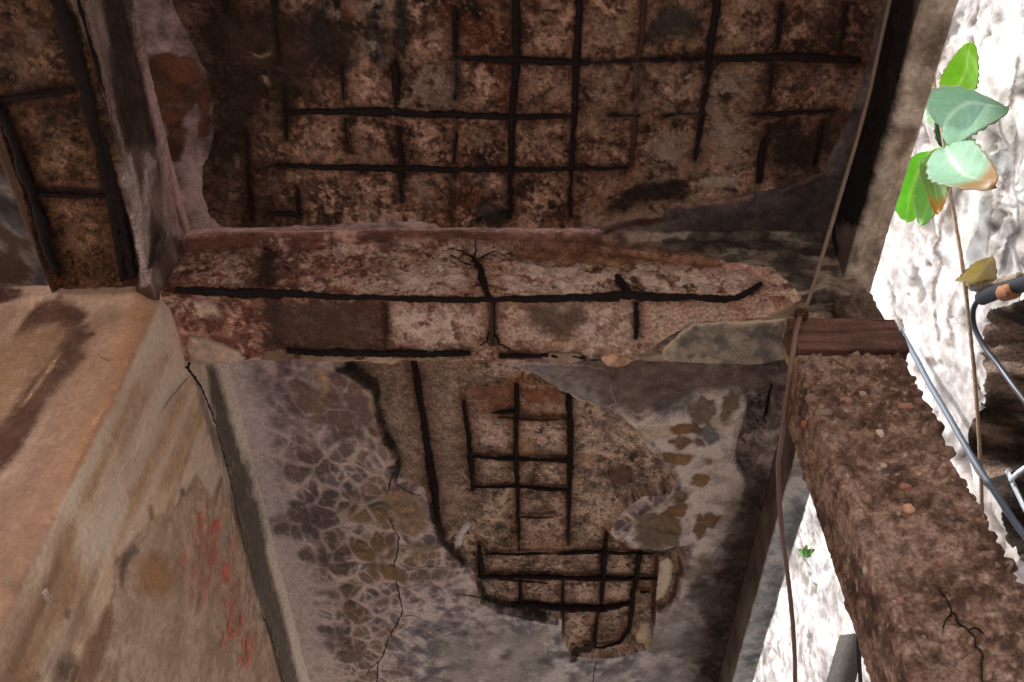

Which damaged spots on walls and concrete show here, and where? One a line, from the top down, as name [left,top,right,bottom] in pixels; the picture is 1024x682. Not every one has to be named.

spalling [0,0,141,293]
corrosion [148,52,211,162]
damp [0,296,95,468]
crack [161,362,247,568]
corrosion [186,233,324,347]
damp [209,369,454,682]
crack [314,361,559,682]
crack [447,237,496,292]
spalling [160,0,884,660]
crack [569,642,596,682]
crack [649,547,683,611]
crack [938,586,985,682]